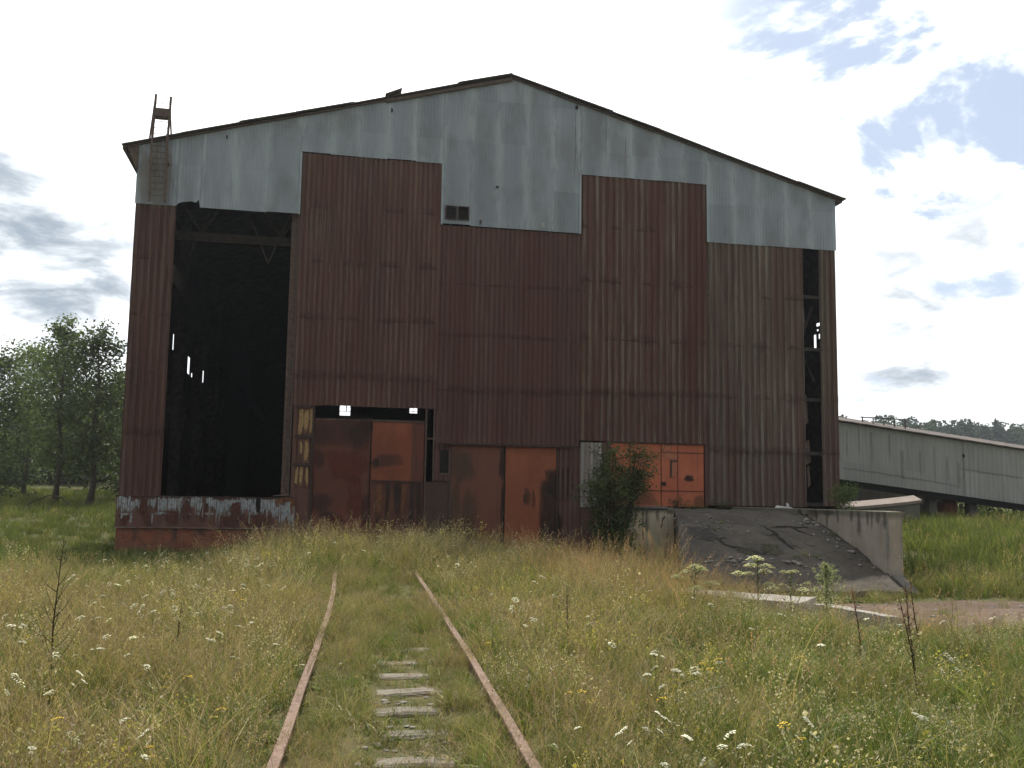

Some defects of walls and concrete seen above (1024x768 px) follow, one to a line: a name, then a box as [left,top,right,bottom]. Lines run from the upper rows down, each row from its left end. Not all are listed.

corrosion [119,498,208,525]
peeling [117,496,294,524]
corrosion [224,498,294,527]
crack [711,525,809,555]